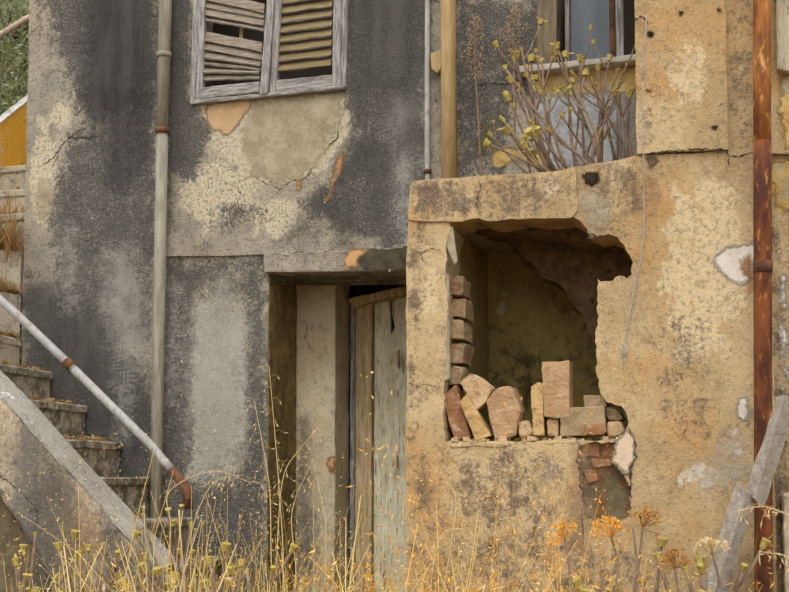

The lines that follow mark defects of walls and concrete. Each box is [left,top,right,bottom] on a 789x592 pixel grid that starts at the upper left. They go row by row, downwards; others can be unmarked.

crack [45,125,110,176]
damp [85,0,158,195]
crack [184,101,352,224]
flaking render [205,93,342,190]
flaking render [323,152,345,204]
spalling [343,246,407,272]
flaking render [777,273,789,397]
flaking render [578,428,636,524]